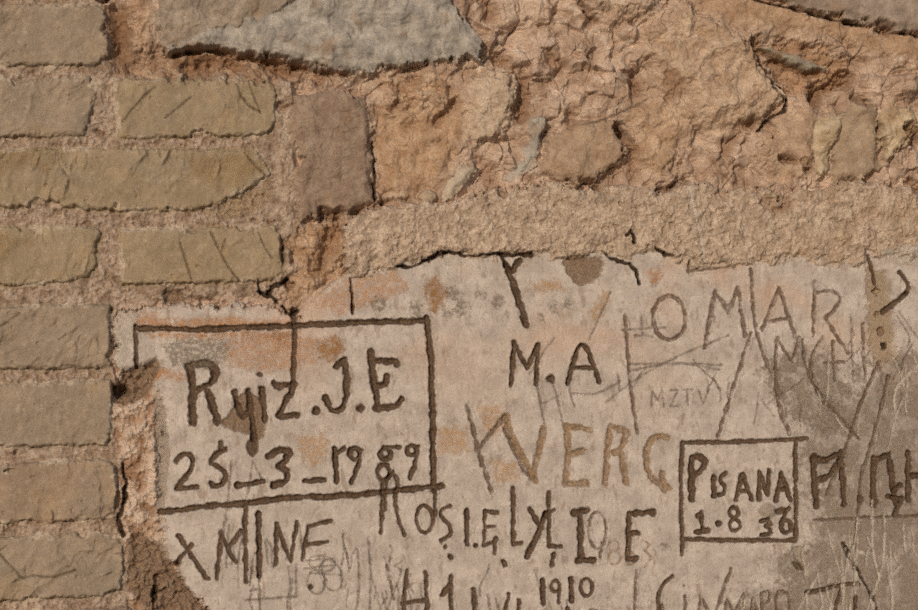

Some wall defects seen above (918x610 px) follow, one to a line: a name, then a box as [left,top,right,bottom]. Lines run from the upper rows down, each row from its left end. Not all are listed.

crack [753,51,787,132]
flaking render [443,254,466,265]
crack [396,250,533,269]
flaking render [113,307,170,511]
flaking render [128,533,201,610]